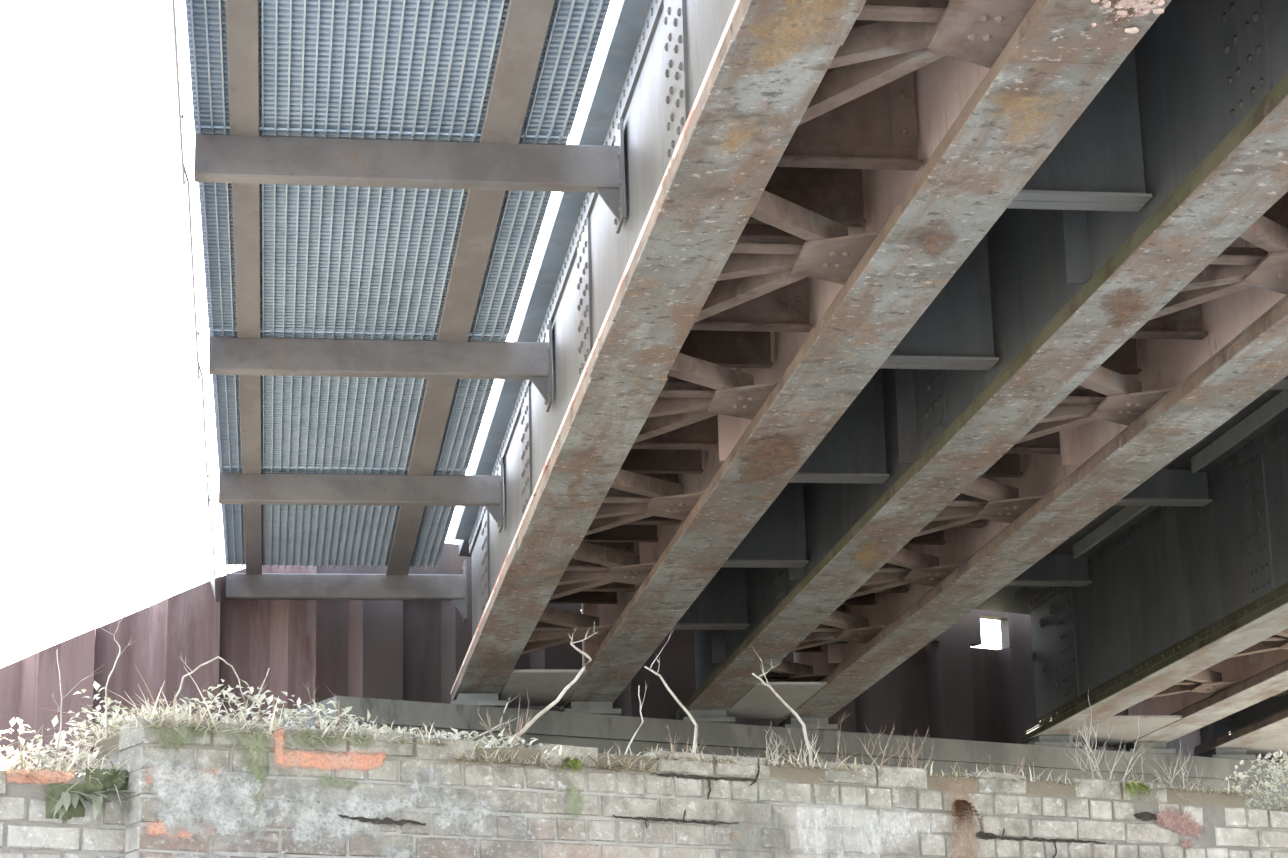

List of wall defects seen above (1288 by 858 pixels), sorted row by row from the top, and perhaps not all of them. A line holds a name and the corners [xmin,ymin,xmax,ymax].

peeling [1091,0,1165,34]
crack [612,758,760,828]
crack [996,828,1106,858]